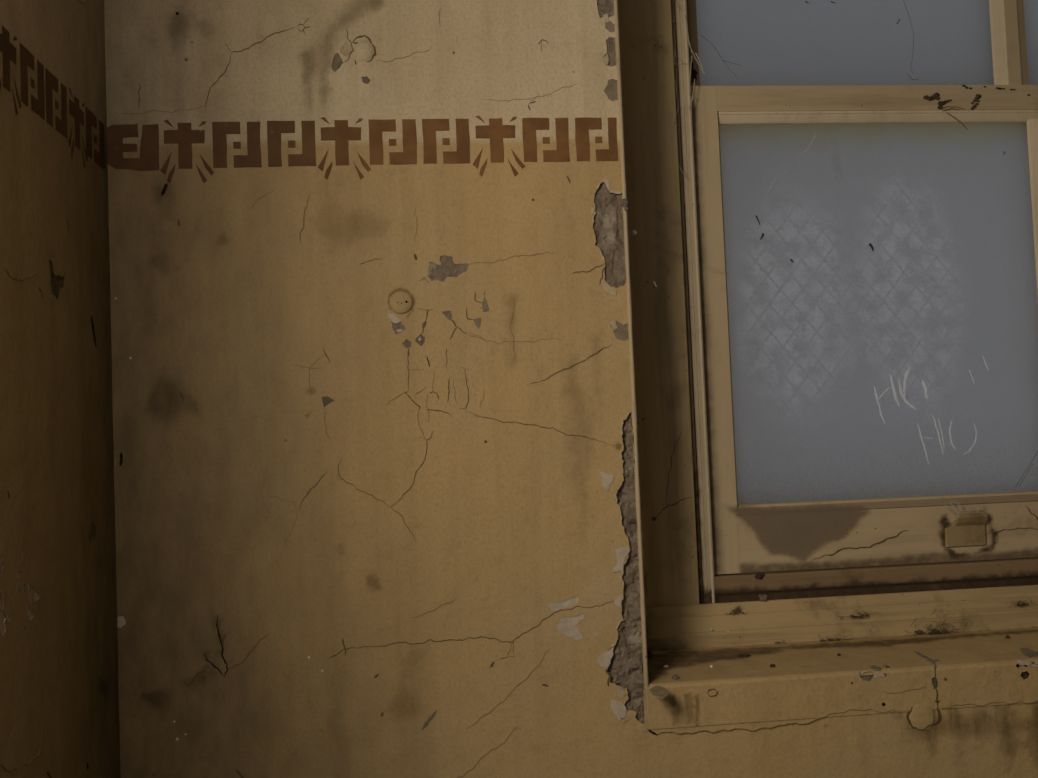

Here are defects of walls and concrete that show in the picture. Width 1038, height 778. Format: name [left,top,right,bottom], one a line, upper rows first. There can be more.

crack [117,18,310,115]
flaking render [597,0,618,101]
peeling [428,255,469,282]
flaking render [573,178,626,296]
crack [264,344,616,548]
flaking render [597,412,669,732]
crack [330,601,612,728]
crack [648,651,939,735]
peeling [1017,648,1038,680]